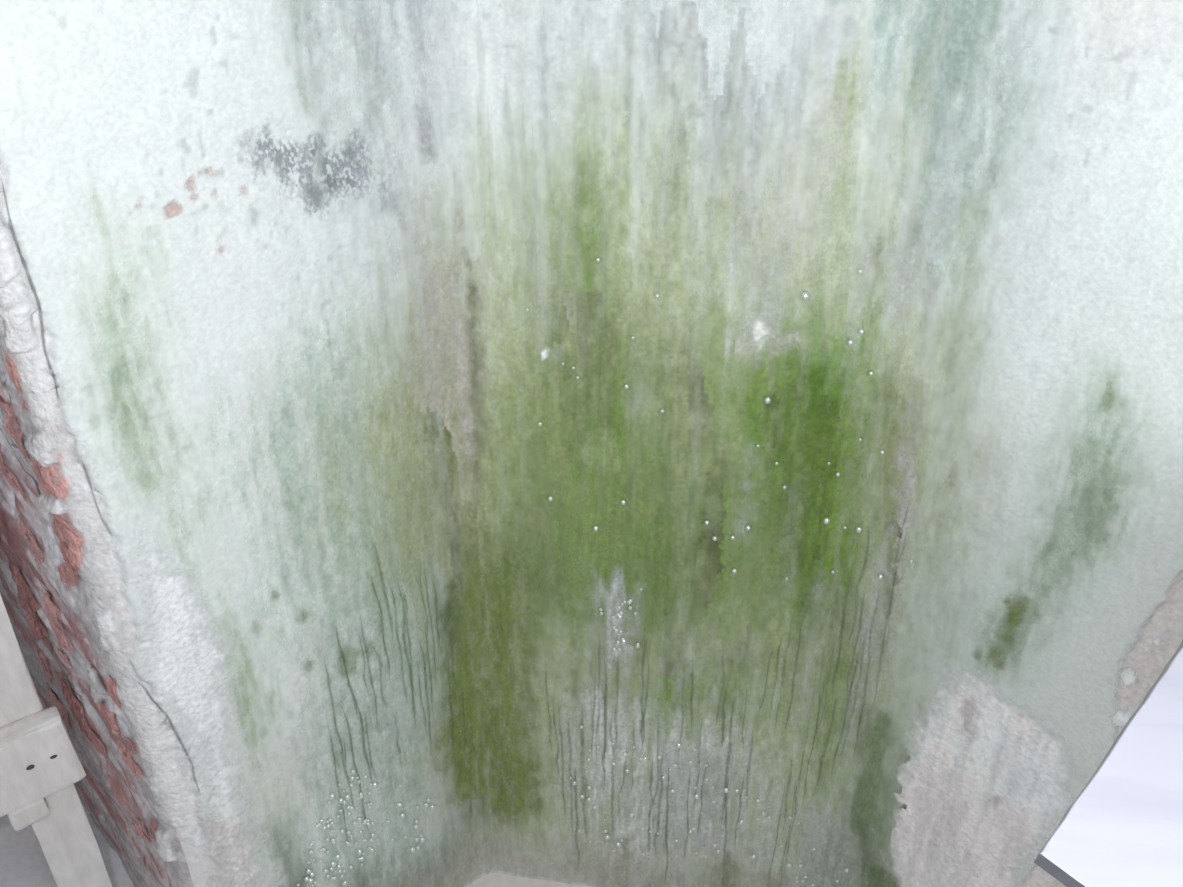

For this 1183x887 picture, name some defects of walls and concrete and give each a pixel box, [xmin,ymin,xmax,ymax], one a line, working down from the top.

peeling [165,168,212,218]
damp [318,0,426,120]
damp [872,0,1010,264]
damp [1103,390,1114,409]
flaking render [0,218,260,887]
damp [241,124,924,887]
damp [976,600,1027,668]
flaking render [1110,571,1183,738]
peeling [890,673,1071,887]